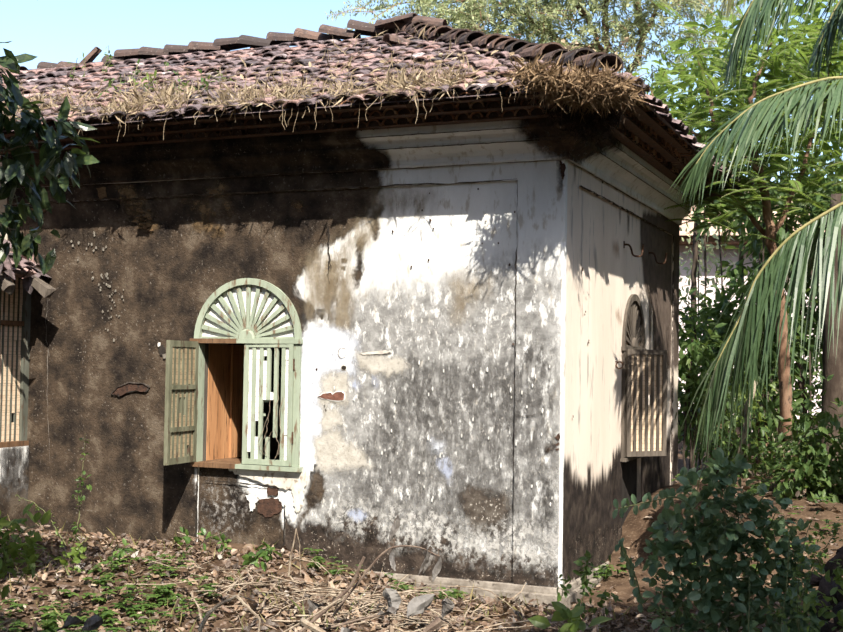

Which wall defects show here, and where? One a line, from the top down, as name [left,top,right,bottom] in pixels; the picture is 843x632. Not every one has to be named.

damp [640,212,680,386]
spalling [246,487,287,518]
damp [0,130,622,588]
peeling [315,365,371,473]
peeling [356,354,407,385]
damp [641,432,678,500]